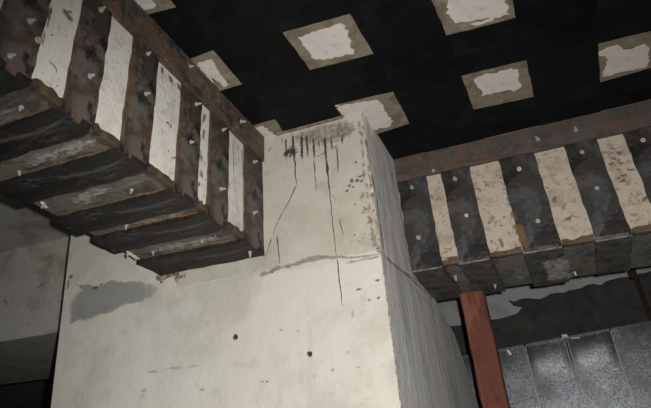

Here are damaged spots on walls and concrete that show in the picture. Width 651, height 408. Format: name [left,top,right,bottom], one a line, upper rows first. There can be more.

corrosion [122,45,136,142]
damp [284,126,350,176]
crack [261,162,432,303]
damp [71,281,151,323]
peeling [156,272,187,284]